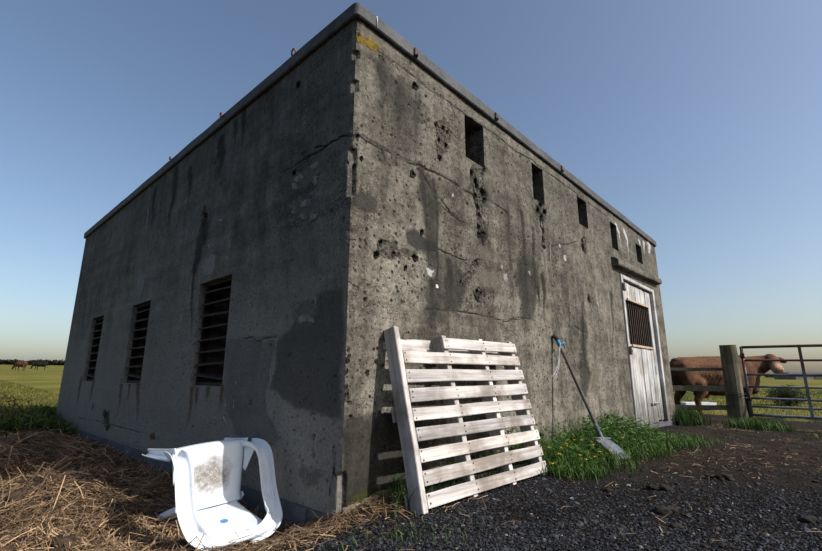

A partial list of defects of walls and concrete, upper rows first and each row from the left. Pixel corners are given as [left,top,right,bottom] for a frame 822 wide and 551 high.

spalling [434,116,451,161]
crack [365,45,606,216]
crack [283,134,508,222]
spalling [470,167,489,245]
crack [428,308,535,327]